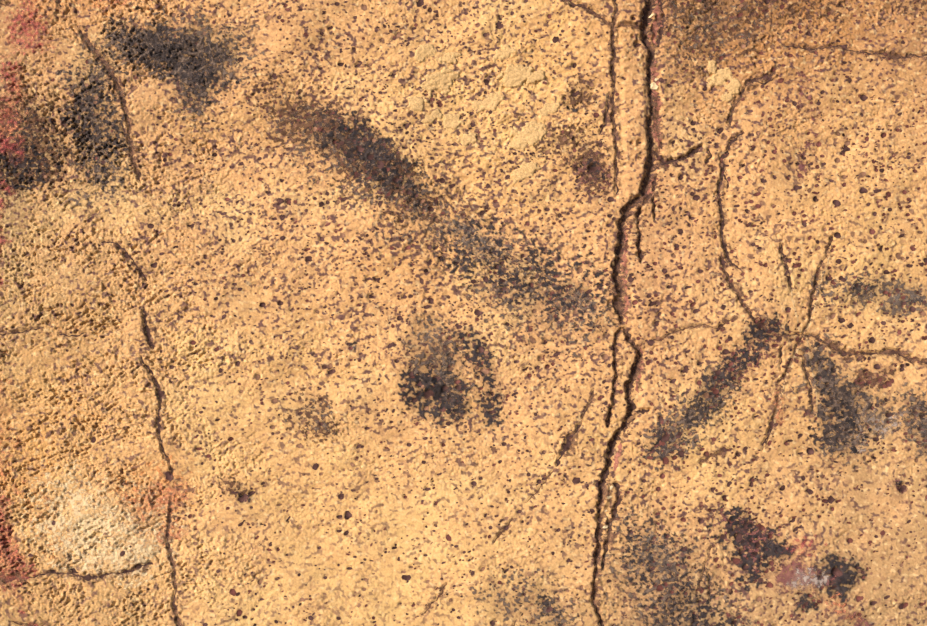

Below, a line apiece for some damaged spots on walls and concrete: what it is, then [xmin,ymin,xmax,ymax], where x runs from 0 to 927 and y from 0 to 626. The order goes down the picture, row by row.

crack [0,326,87,339]
crack [101,239,147,281]
crack [140,306,175,475]
crack [494,0,927,626]
crack [0,498,184,626]
crack [421,583,447,615]